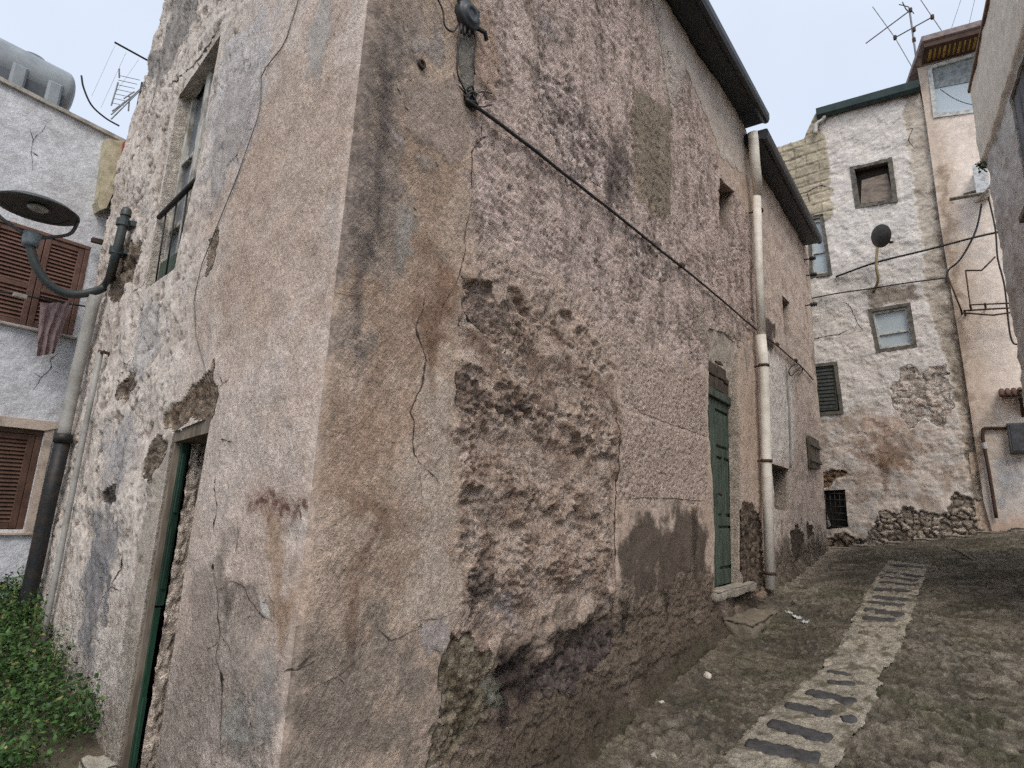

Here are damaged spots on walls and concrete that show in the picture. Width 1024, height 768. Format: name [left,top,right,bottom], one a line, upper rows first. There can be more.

crack [172,30,218,83]
spalling [108,239,143,302]
crack [403,120,487,494]
spalling [458,279,518,336]
spalling [141,358,219,483]
spalling [454,357,538,423]
spalling [890,364,955,429]
spalling [823,470,846,487]
damp [618,501,709,631]
spalling [738,500,772,602]
spalling [828,493,990,547]
crack [208,575,274,755]